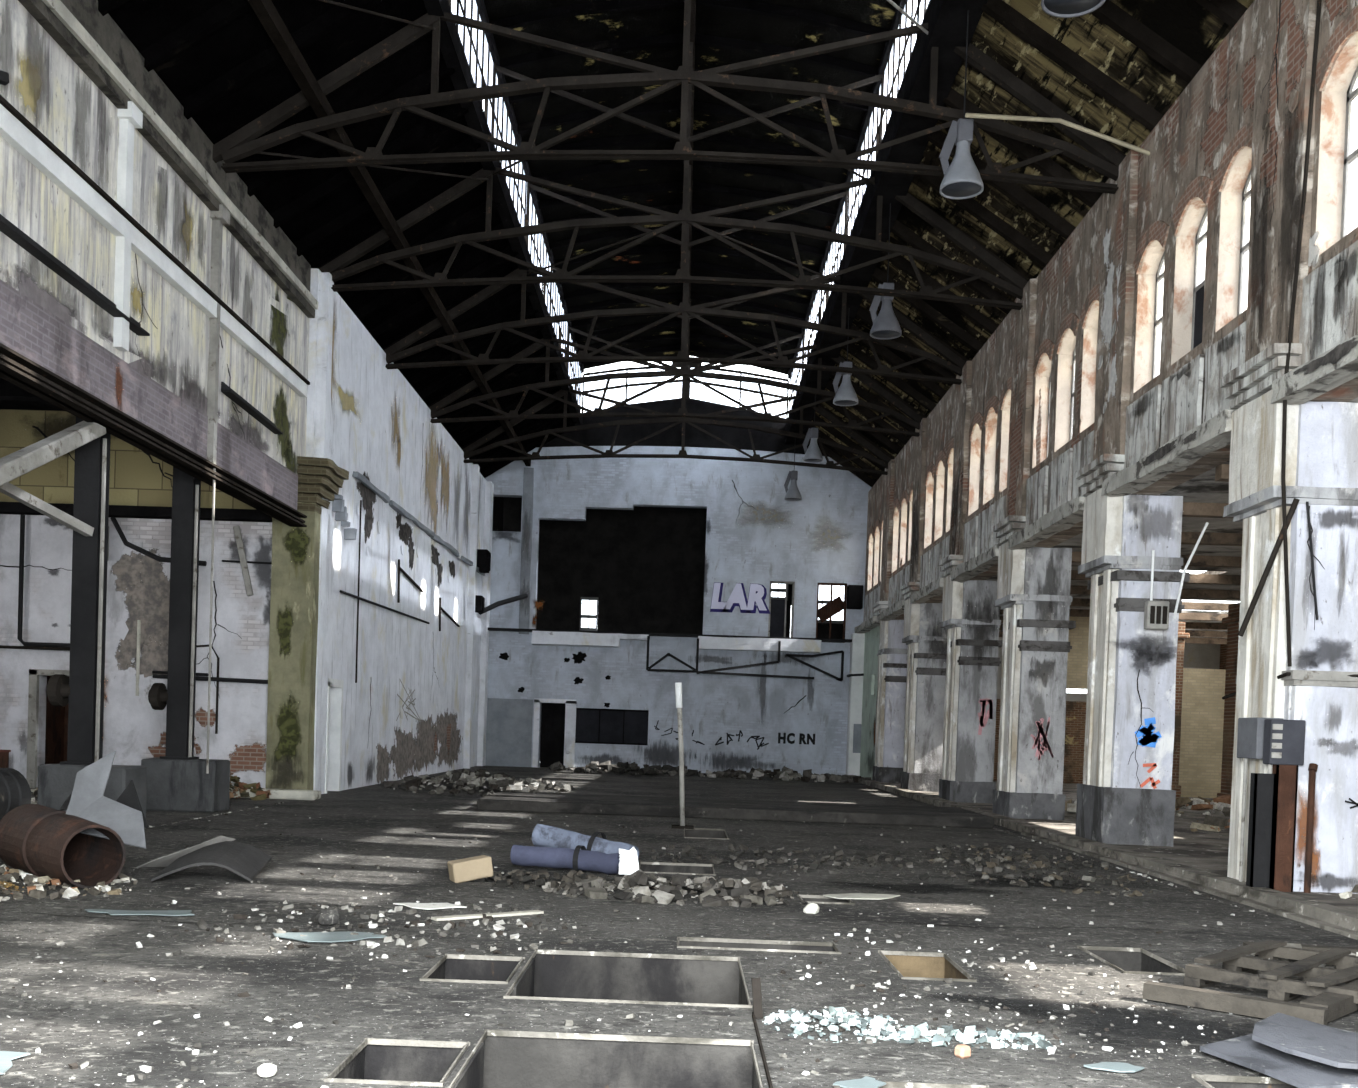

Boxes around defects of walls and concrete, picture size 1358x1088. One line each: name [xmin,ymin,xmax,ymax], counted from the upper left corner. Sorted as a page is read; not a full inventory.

leakage [1312,252,1357,357]
flaking render [110,539,170,688]
leakage [1133,651,1168,673]
flaking render [148,718,166,757]
flaking render [194,707,216,757]
flaking render [229,729,266,773]
leakage [271,757,303,789]
flaking render [376,694,463,784]